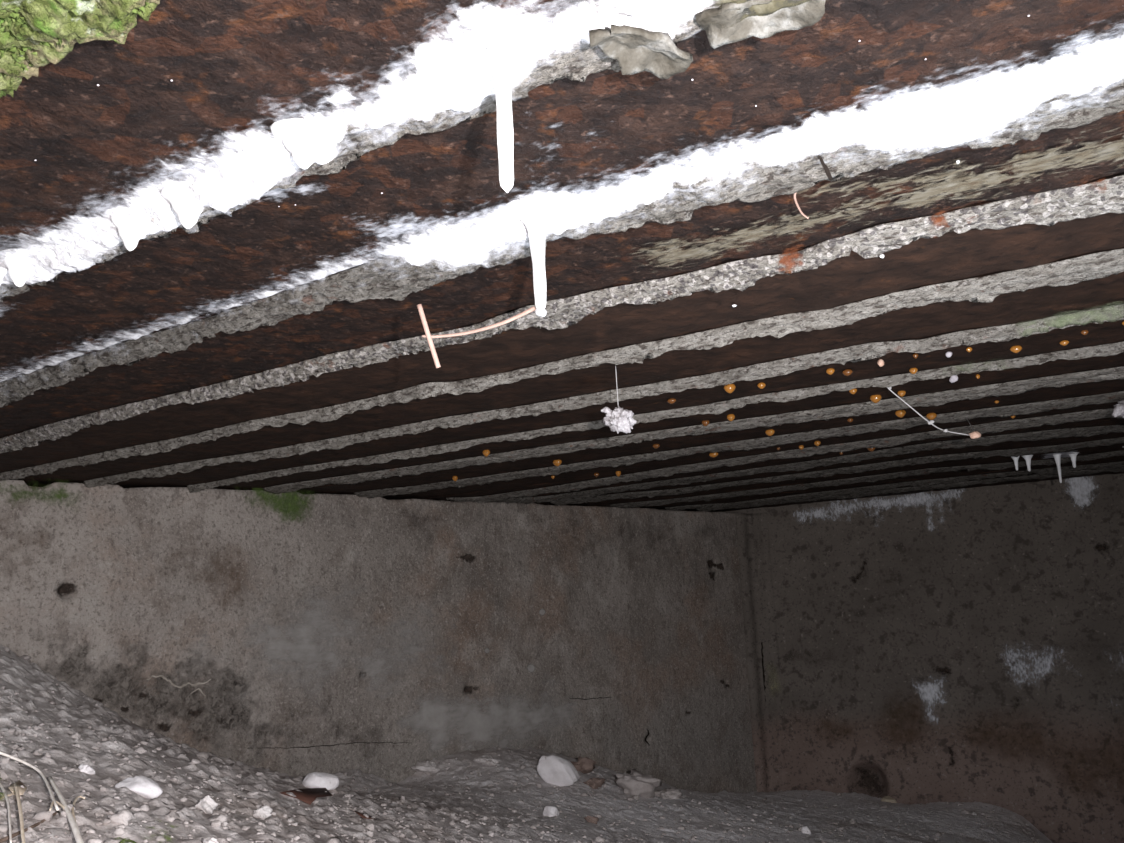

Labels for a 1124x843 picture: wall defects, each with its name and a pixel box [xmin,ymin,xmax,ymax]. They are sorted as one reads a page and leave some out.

damp [0,0,1124,317]
peeling [635,128,1124,268]
corrosion [779,245,803,273]
damp [0,315,196,382]
damp [797,489,963,530]
damp [1065,477,1098,507]
damp [1006,647,1062,682]
damp [915,681,945,721]